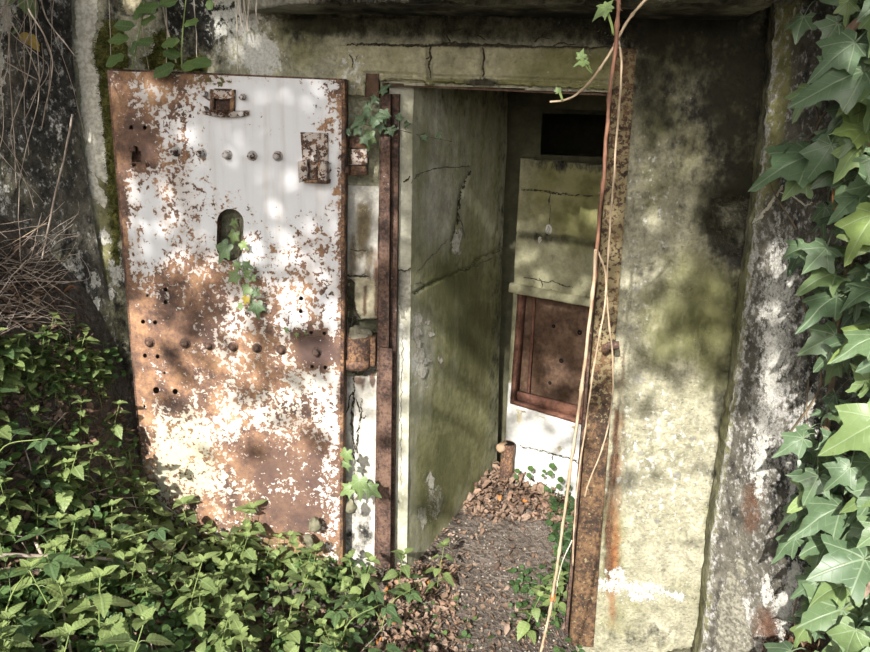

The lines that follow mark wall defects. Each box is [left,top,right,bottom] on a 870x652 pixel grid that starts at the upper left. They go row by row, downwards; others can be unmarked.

crack [346,20,611,79]
water stain [636,11,768,238]
water stain [97,225,113,245]
crack [399,165,500,295]
crack [523,189,593,227]
water stain [90,260,125,310]
crack [524,277,573,290]
crack [347,376,367,500]
corrosion [604,410,618,579]
water stain [598,566,684,602]